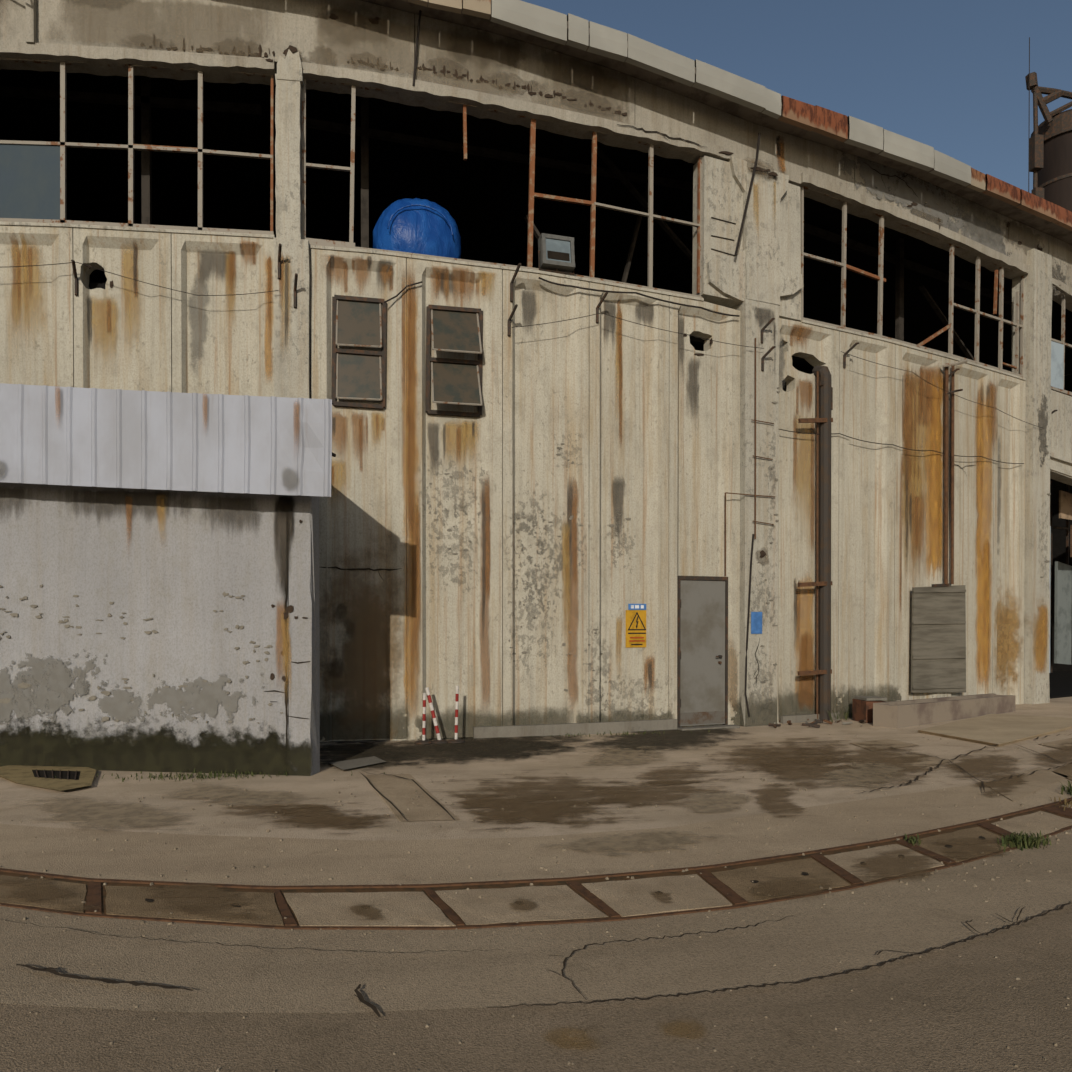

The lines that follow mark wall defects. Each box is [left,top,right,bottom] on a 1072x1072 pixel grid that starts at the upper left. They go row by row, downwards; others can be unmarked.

peeling [0,585,43,618]
spalling [271,604,307,619]
peeling [0,641,289,728]